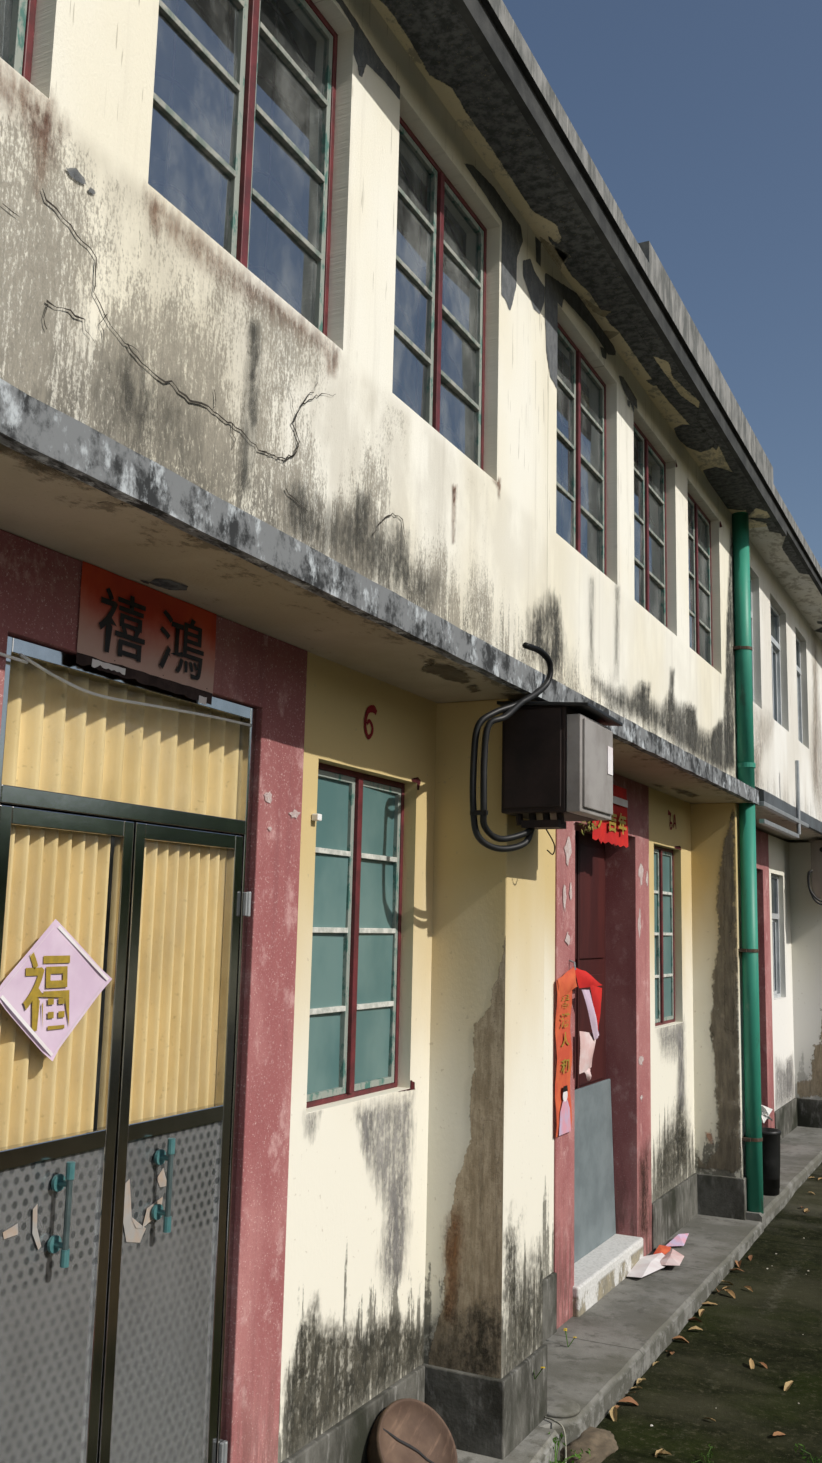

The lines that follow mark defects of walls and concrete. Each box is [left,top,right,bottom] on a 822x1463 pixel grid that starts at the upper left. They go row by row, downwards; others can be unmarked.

peeling [336,0,400,100]
crack [3,188,334,518]
water stain [242,326,258,487]
peeling [380,0,809,575]
water stain [602,533,735,769]
water stain [640,812,741,1234]
water stain [286,937,543,1454]